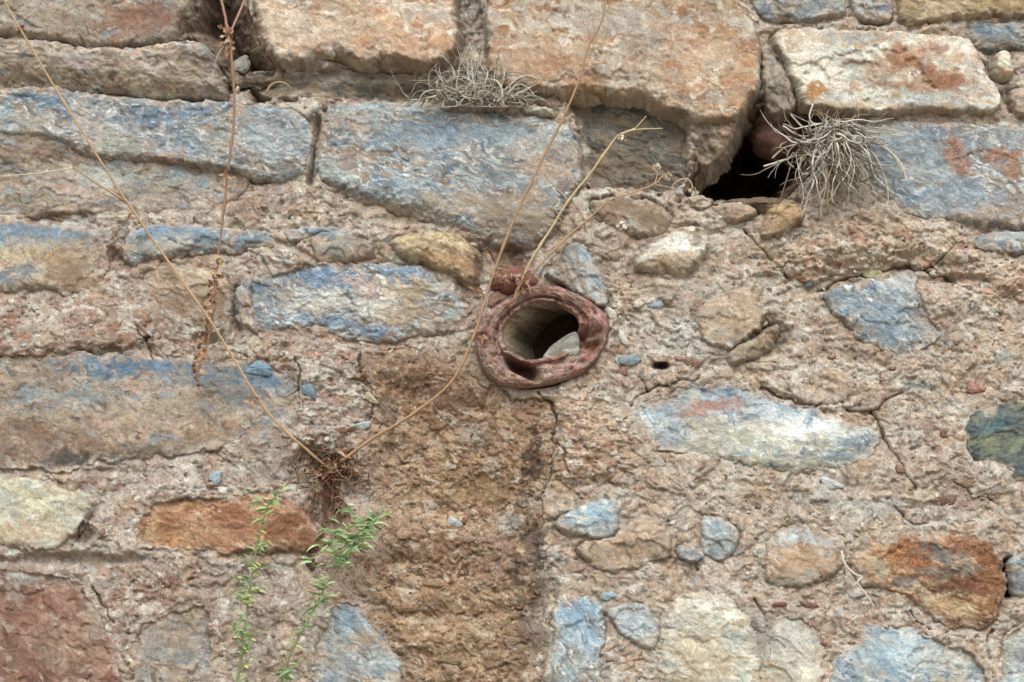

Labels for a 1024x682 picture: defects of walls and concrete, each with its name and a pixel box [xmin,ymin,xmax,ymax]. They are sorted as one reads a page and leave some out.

damp [522,418,545,479]
crack [537,391,570,474]
crack [760,386,917,491]